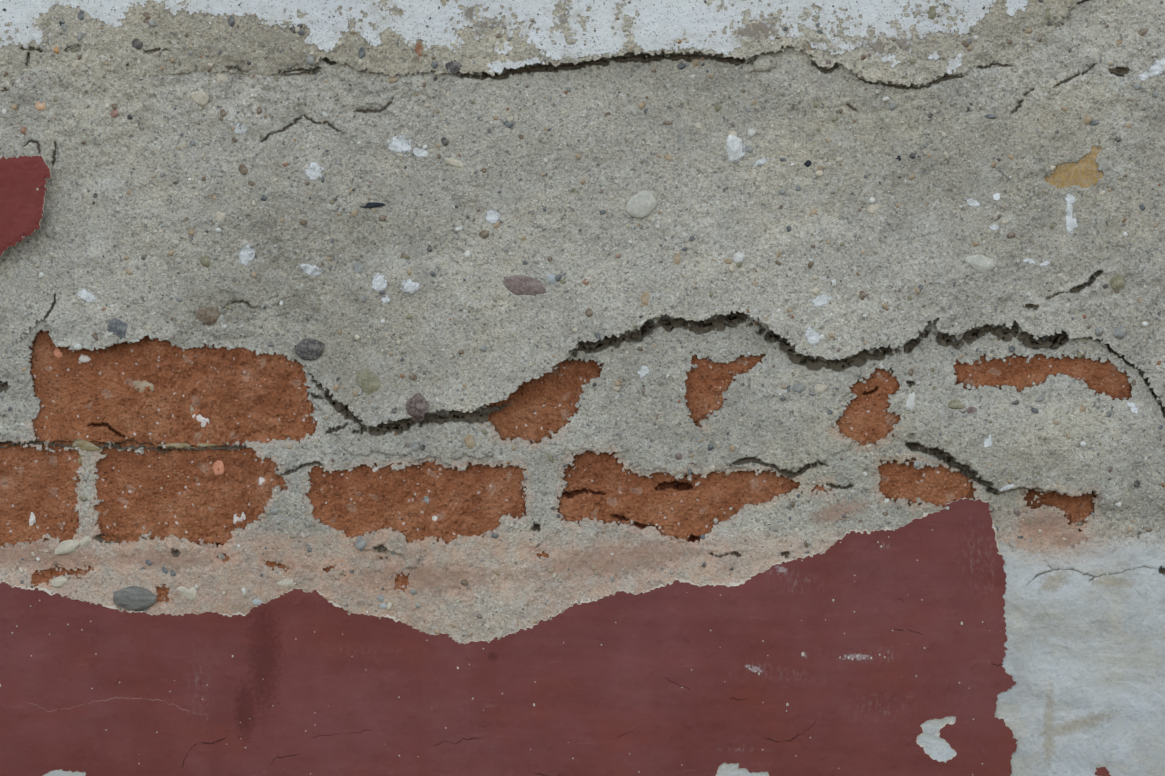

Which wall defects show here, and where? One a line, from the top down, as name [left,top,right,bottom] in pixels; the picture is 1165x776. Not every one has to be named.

crack [457,54,755,80]
crack [811,61,1013,111]
crack [1011,63,1097,113]
flaking render [0,0,1165,427]
crack [572,311,1165,417]
crack [309,374,511,435]
crack [0,423,247,453]
crack [281,462,324,475]
crack [905,442,999,495]
flaking render [0,305,1165,776]